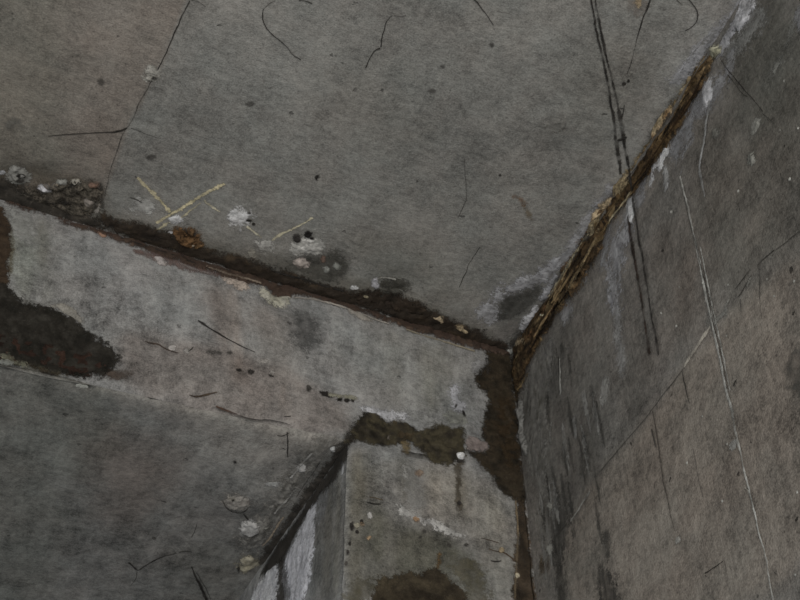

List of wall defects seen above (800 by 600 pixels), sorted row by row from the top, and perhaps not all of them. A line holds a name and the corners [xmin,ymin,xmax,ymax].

spalling [0,164,103,217]
crack [51,0,206,193]
corrosion [168,226,204,249]
leakage [0,177,537,600]
leakage [474,0,767,393]
crack [591,0,659,355]